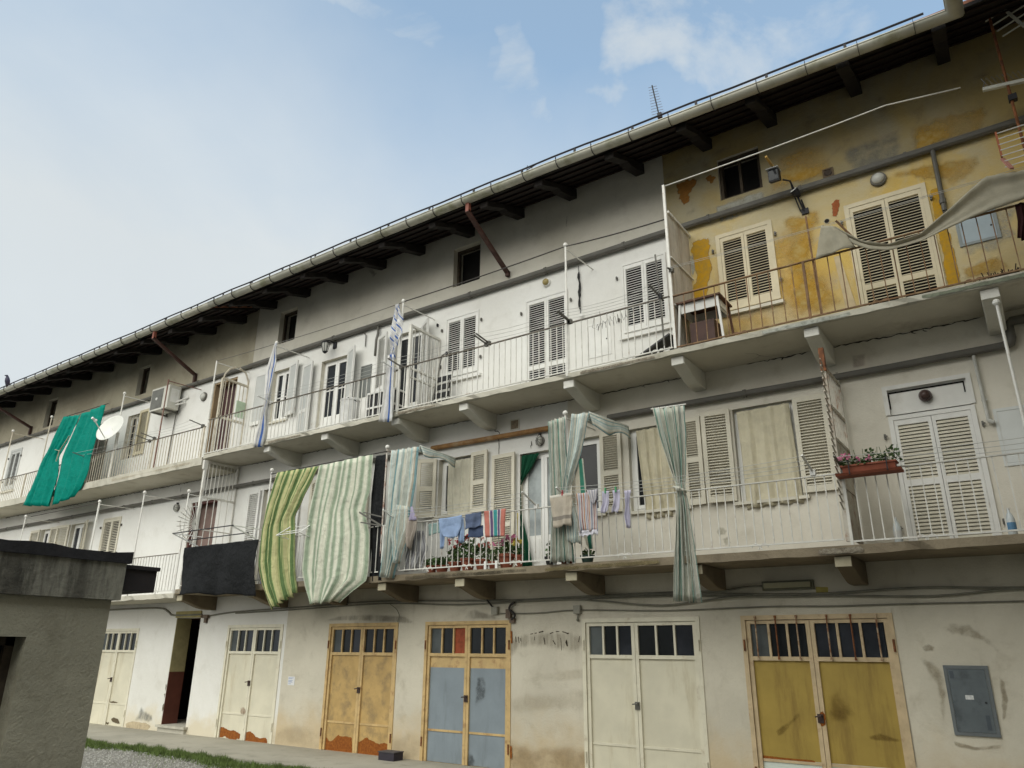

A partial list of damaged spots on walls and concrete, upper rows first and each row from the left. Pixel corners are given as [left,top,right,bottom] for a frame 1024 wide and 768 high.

peeling [676,175,716,204]